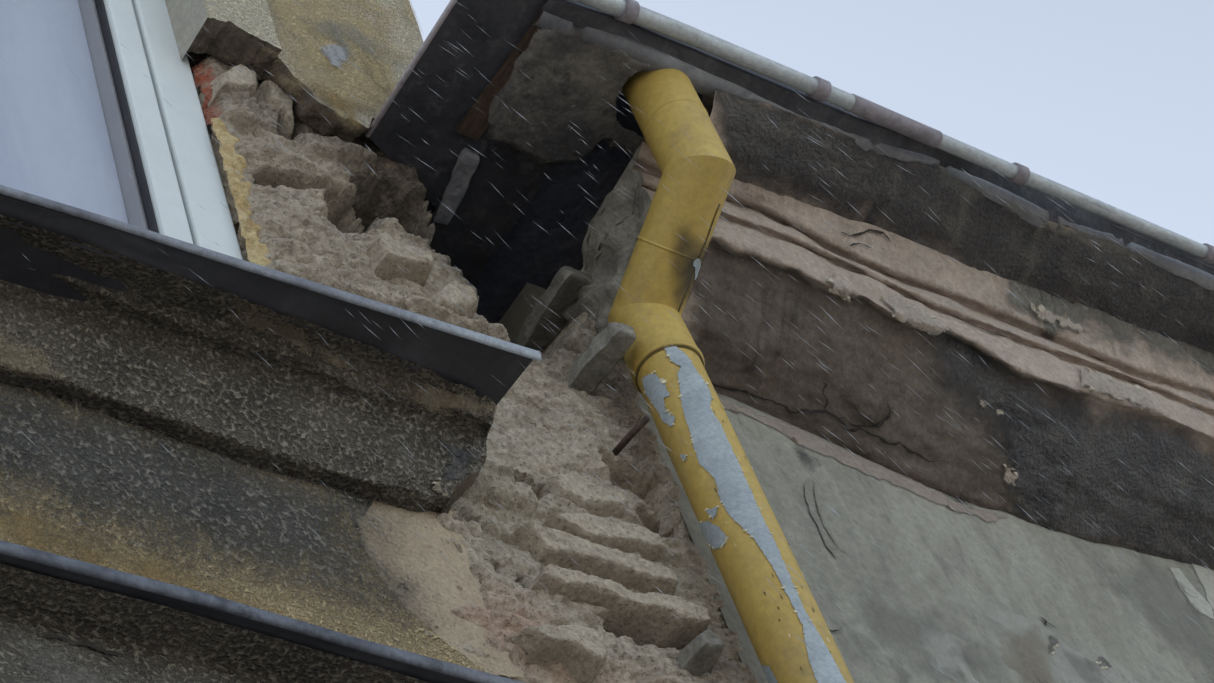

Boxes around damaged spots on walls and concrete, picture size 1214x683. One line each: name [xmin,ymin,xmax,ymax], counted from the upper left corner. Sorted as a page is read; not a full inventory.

flaking render [186,17,1007,683]
peeling [1009,279,1214,374]
crack [711,382,948,463]